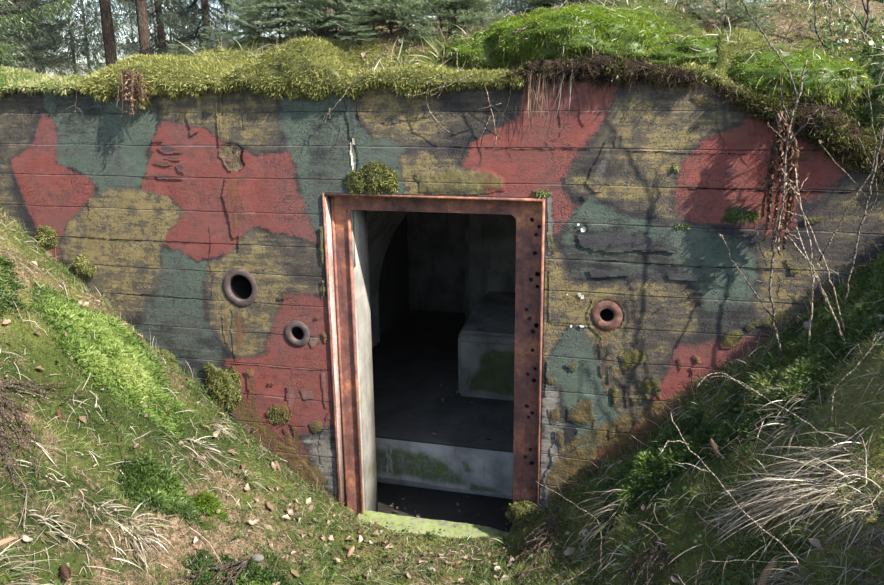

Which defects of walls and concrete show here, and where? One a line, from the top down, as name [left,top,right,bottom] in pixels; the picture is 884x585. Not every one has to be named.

peeling [286,371,333,493]